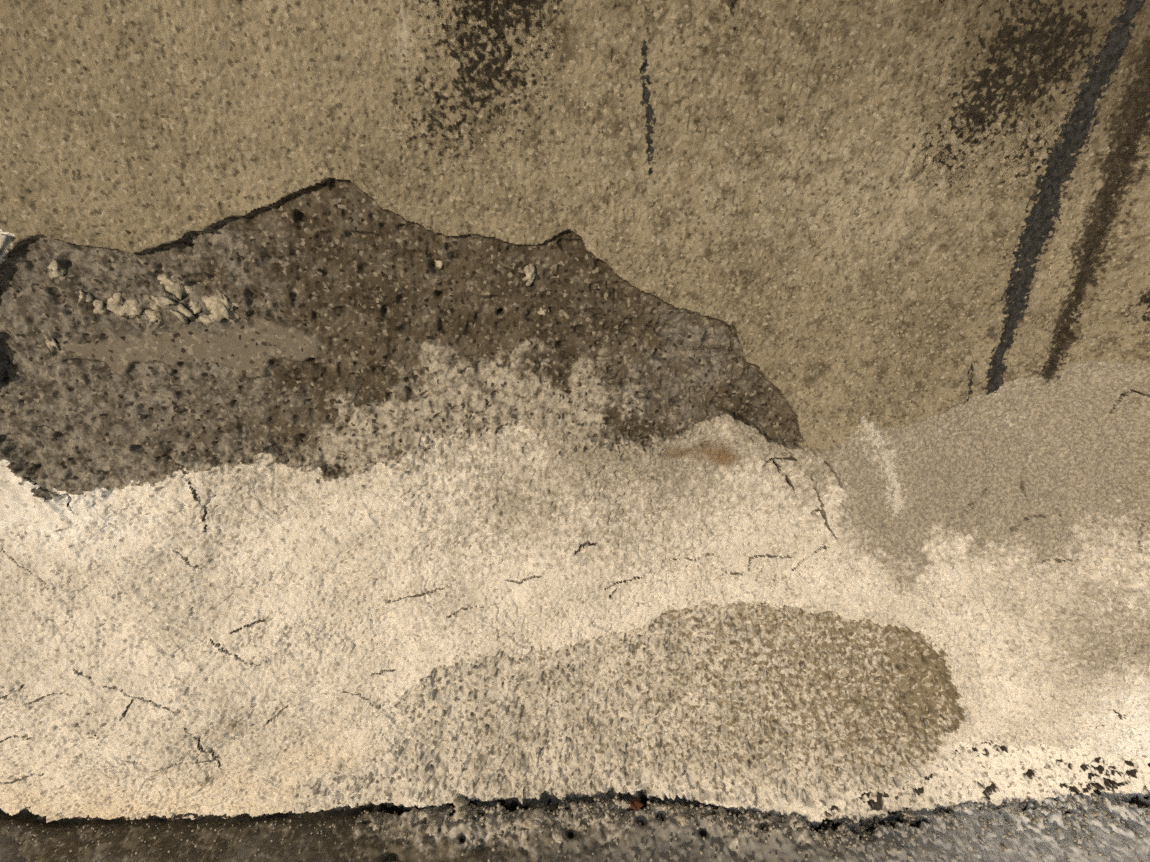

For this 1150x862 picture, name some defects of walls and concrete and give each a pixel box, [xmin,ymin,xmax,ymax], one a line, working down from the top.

water stain [392,0,565,175]
water stain [639,41,656,174]
water stain [911,0,1150,401]
crack [388,585,484,618]
crack [505,575,540,584]
spalling [0,177,1150,831]
crack [605,455,845,599]